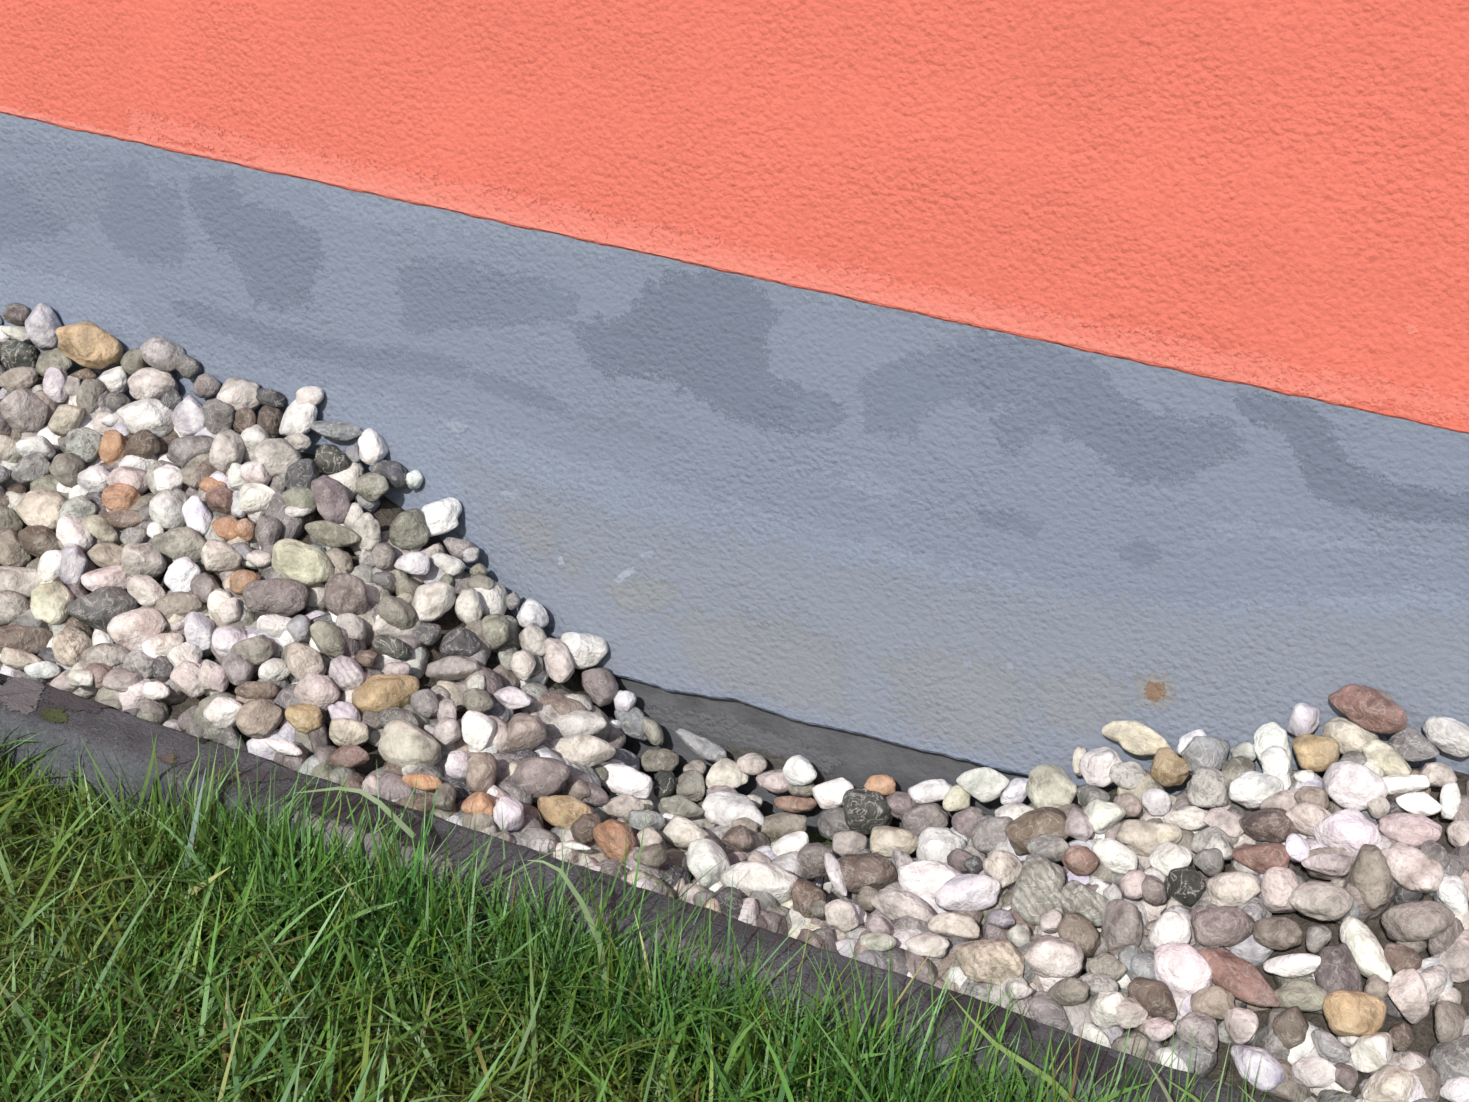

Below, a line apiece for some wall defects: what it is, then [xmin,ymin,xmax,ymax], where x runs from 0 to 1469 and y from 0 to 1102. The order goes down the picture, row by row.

damp [0,127,1469,608]
rust [1133,671,1180,711]